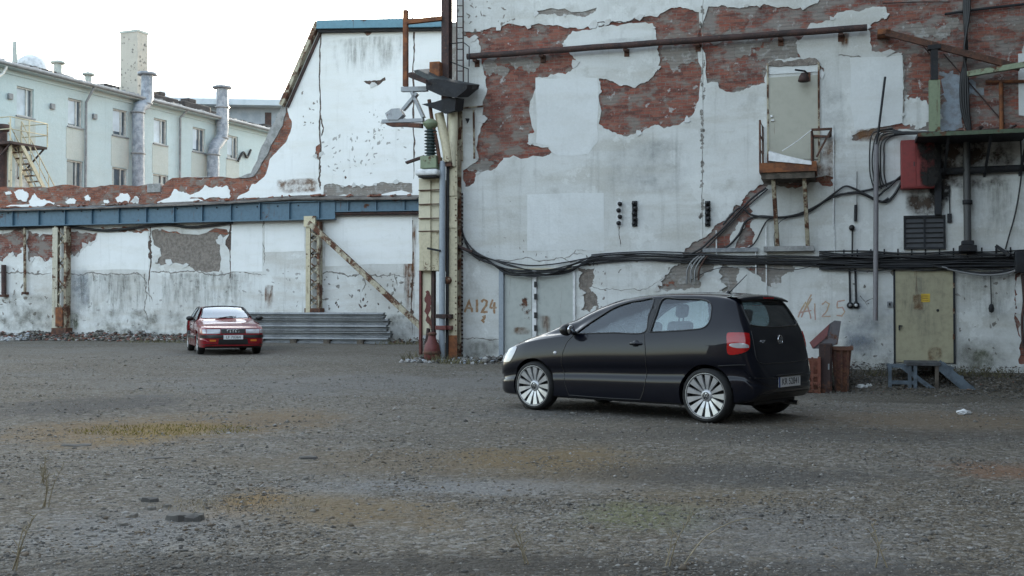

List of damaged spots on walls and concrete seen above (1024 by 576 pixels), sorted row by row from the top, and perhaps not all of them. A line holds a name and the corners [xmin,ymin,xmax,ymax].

flaking render [0,101,318,207]
crack [317,36,325,189]
flaking render [458,0,1024,187]
flaking render [0,229,52,325]
crack [0,221,265,323]
flaking render [71,226,263,313]
flaking render [578,255,621,312]
flaking render [654,175,838,292]